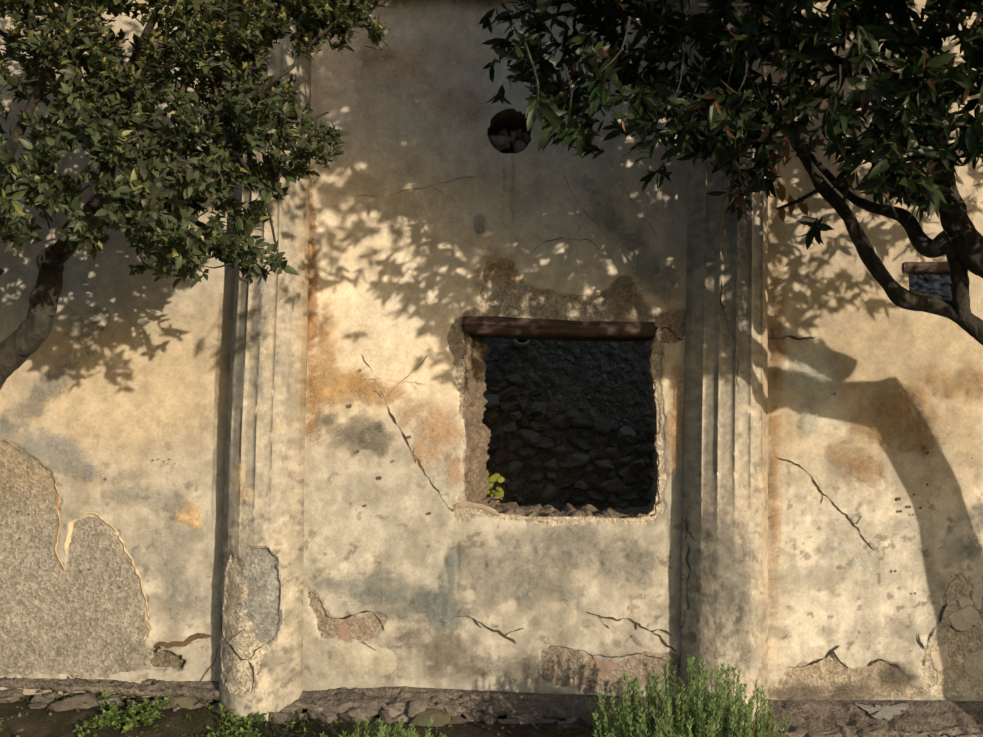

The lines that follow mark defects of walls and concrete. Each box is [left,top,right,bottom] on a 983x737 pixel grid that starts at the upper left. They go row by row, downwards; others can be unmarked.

spalling [0,440,154,679]
spalling [219,546,282,696]
spalling [308,590,386,642]
crack [361,354,455,512]
crack [441,608,524,644]
spalling [447,259,686,526]
crack [551,507,694,671]
crack [777,457,874,550]
spalling [768,575,983,720]